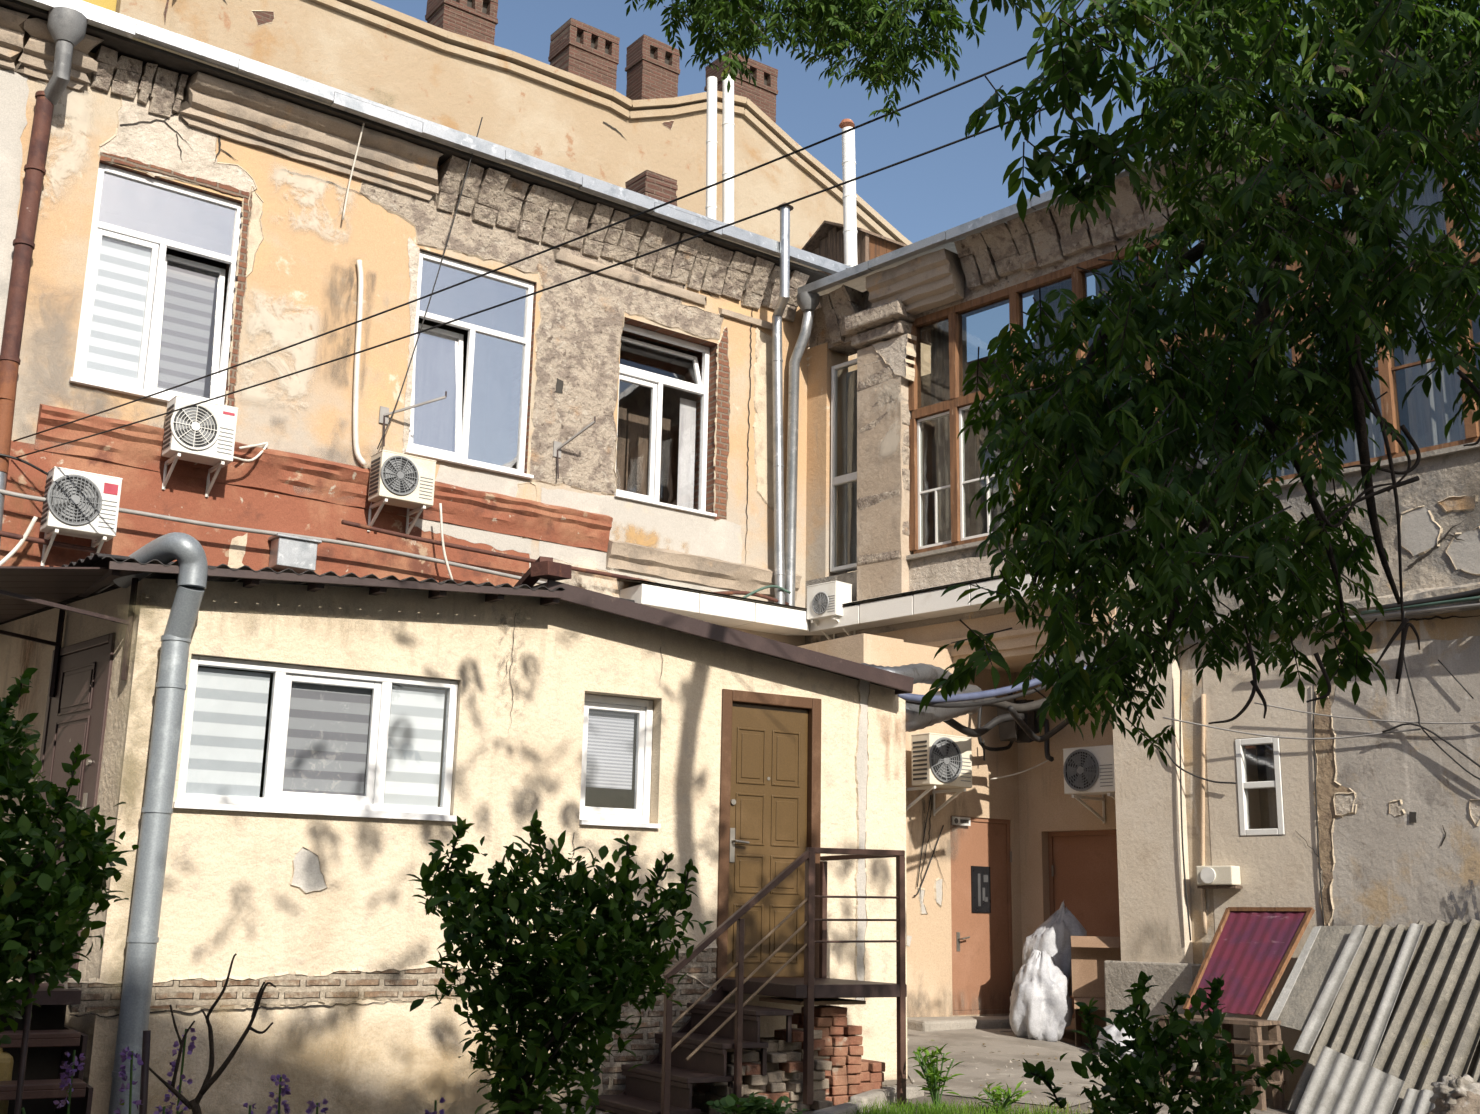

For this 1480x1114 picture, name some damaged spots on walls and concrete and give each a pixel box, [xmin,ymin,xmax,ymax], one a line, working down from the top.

crack [120,113,238,163]
spalling [1400,494,1480,576]
spalling [1312,636,1480,928]
peeling [290,846,327,894]
spalling [64,978,123,1015]
spalling [150,962,505,1014]